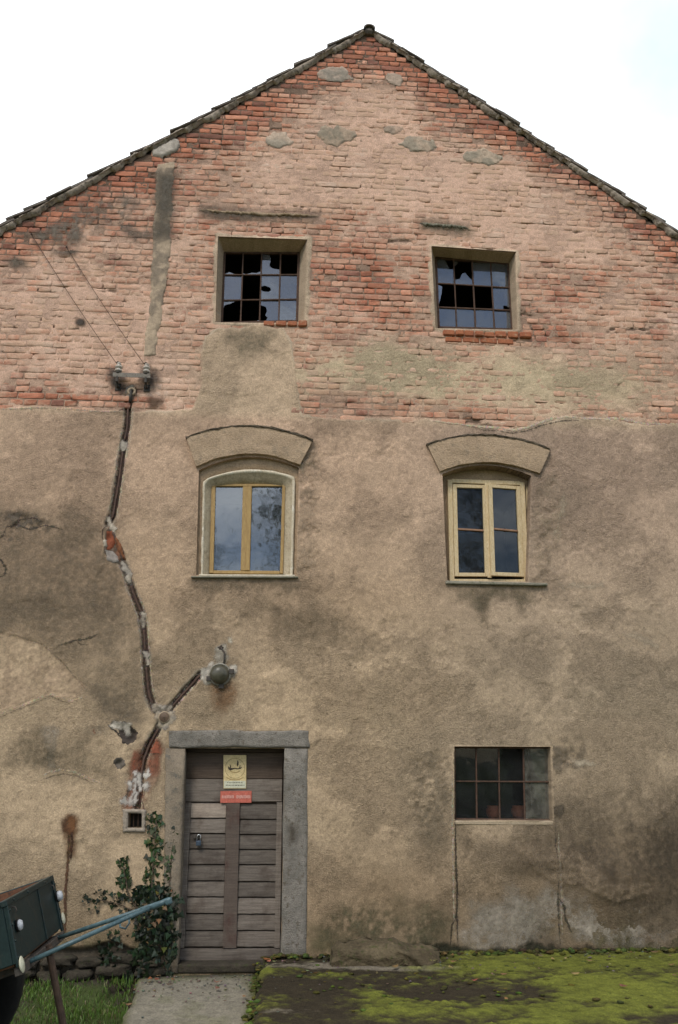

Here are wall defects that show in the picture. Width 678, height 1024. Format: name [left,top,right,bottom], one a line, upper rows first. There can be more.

flaking render [103,527,126,563]
peeling [108,721,161,810]
corrosion [62,814,77,932]
crack [450,750,458,945]
crack [555,827,572,945]